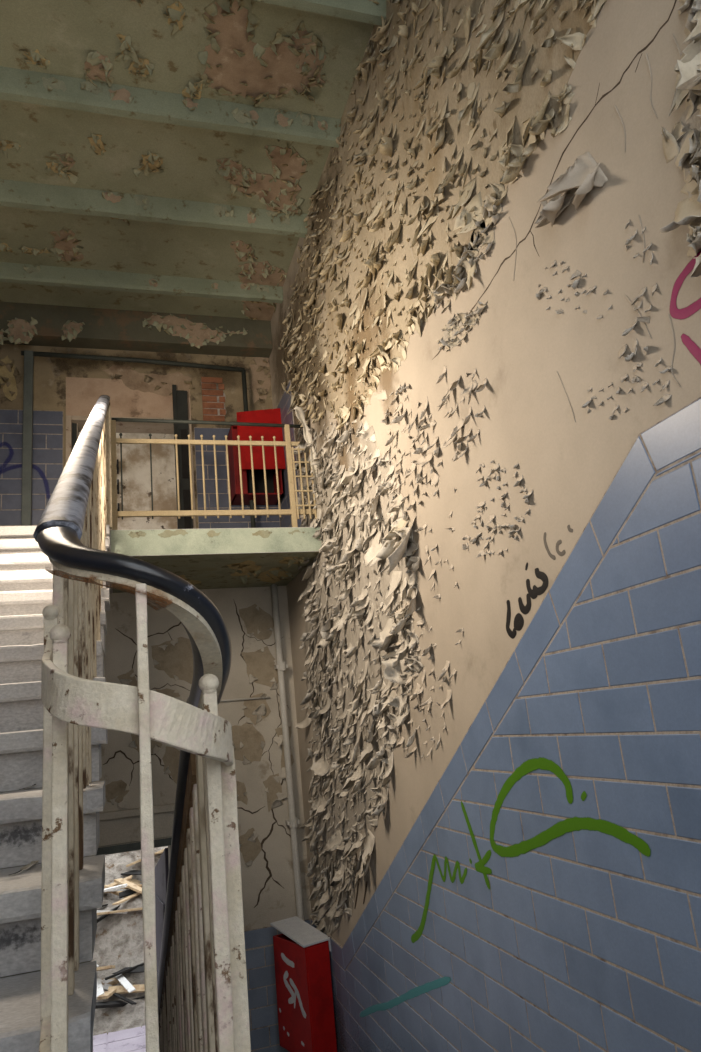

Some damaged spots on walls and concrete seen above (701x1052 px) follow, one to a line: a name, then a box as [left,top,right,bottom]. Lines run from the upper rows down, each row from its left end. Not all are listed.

crack [462,0,677,324]
peeling [660,0,701,278]
peeling [61,320,85,342]
peeling [582,283,671,420]
spalling [128,529,188,538]
peeling [143,0,612,937]
peeling [128,733,180,784]